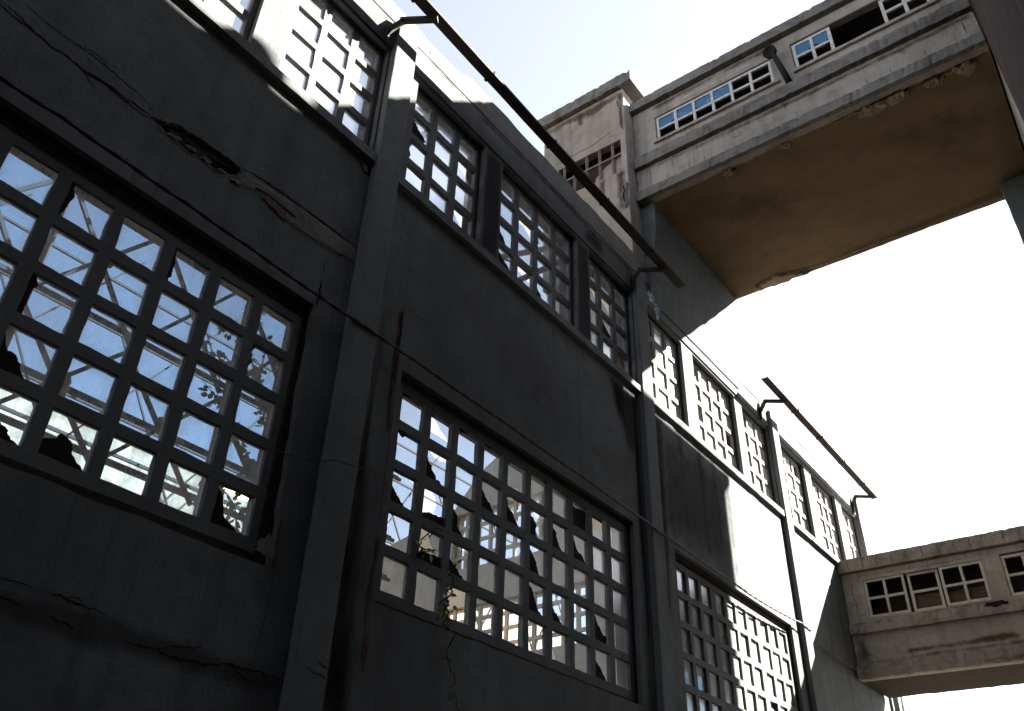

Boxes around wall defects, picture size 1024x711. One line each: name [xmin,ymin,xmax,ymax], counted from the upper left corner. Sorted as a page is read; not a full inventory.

crack [0,2,153,119]
peeling [823,86,912,127]
spalling [151,116,243,186]
peeling [746,223,933,293]
crack [0,577,108,629]
crack [122,574,284,687]